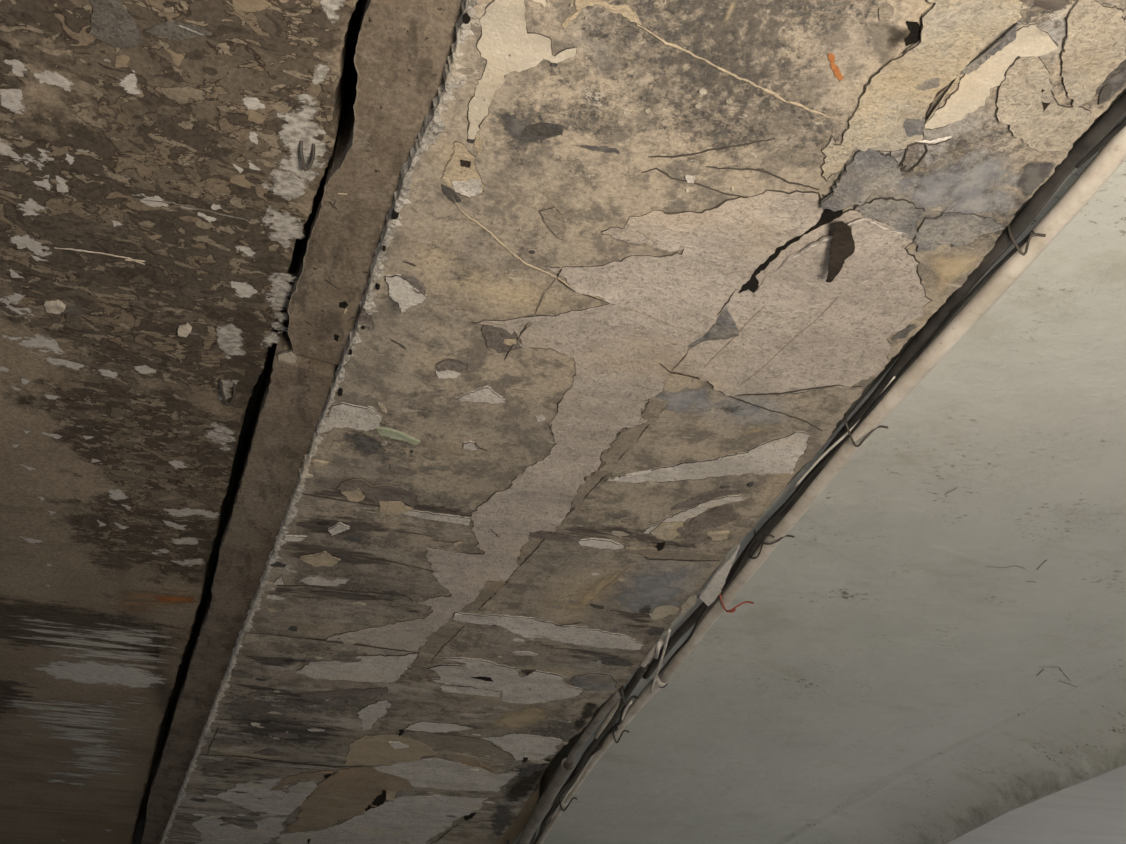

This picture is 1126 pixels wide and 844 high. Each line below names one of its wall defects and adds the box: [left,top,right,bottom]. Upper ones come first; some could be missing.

water stain [89,0,212,49]
water stain [320,0,345,23]
water stain [262,64,329,248]
crack [641,138,819,198]
water stain [260,273,297,347]
water stain [218,380,240,400]
water stain [216,323,246,359]
peeling [271,0,1126,730]
water stain [204,422,236,453]
water stain [0,597,181,788]